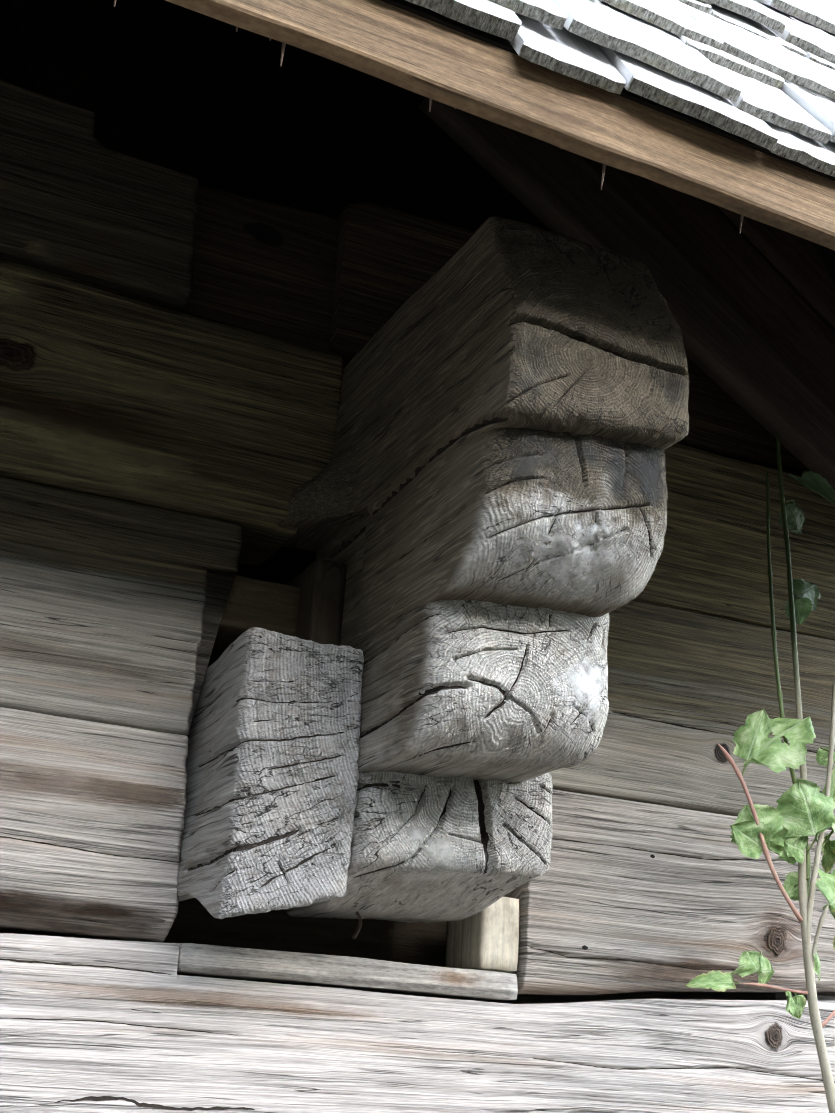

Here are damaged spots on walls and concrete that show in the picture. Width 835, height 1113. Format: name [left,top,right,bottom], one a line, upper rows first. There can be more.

crack [331,322,651,581]
crack [196,613,781,878]
crack [55,1096,255,1111]